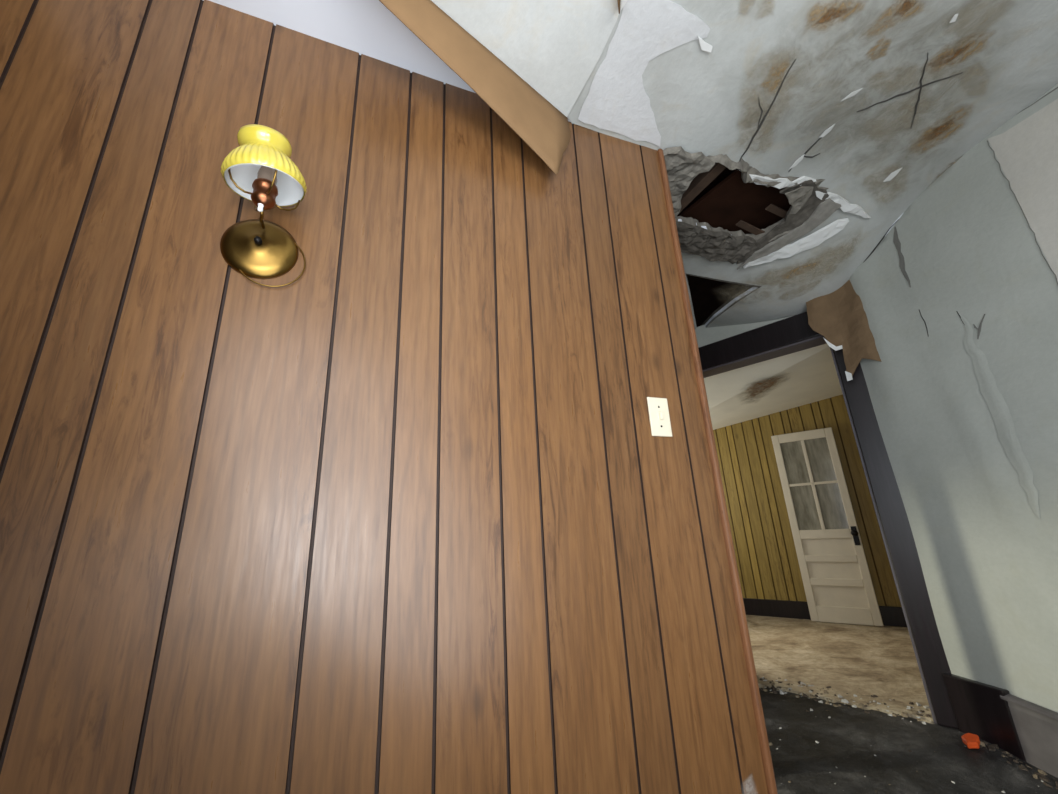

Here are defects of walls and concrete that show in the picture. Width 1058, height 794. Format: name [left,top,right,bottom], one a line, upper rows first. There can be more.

damp [809,1,861,26]
damp [868,0,921,56]
damp [902,35,987,158]
crack [987,141,1058,284]